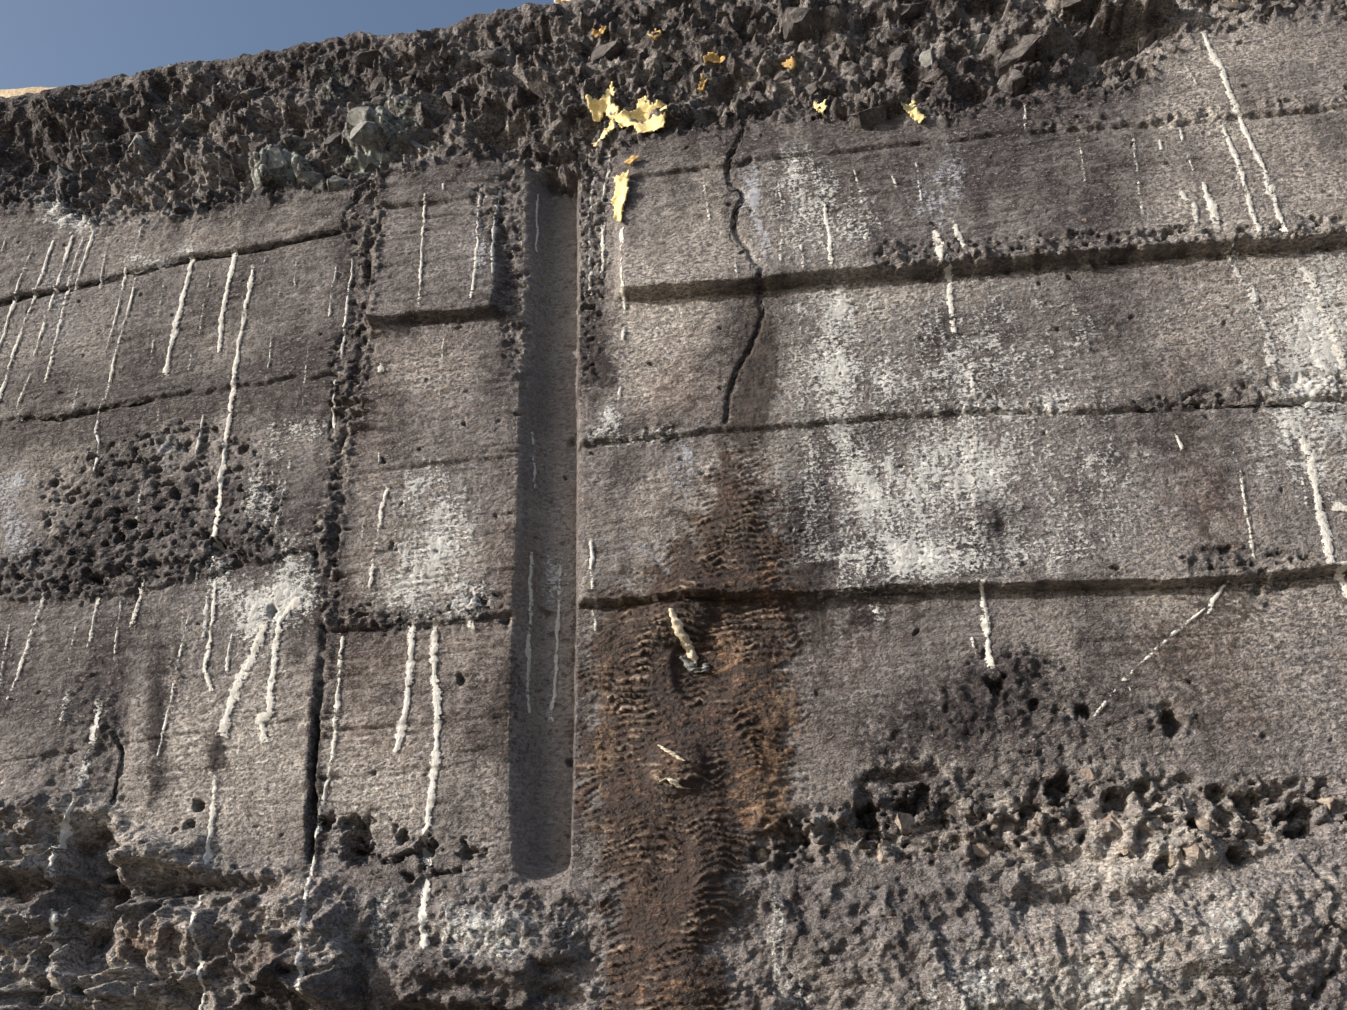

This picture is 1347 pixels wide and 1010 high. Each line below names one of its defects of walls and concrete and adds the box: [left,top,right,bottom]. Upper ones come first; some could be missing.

water stain [0,191,106,421]
water stain [93,220,197,472]
water stain [143,246,337,865]
crack [307,714,320,863]
water stain [315,636,345,838]
water stain [361,456,595,963]
spalling [0,0,1347,637]
rust [575,276,871,1010]
crack [723,123,764,423]
spalling [757,636,1347,880]
water stain [1201,31,1289,232]
water stain [1224,234,1347,598]